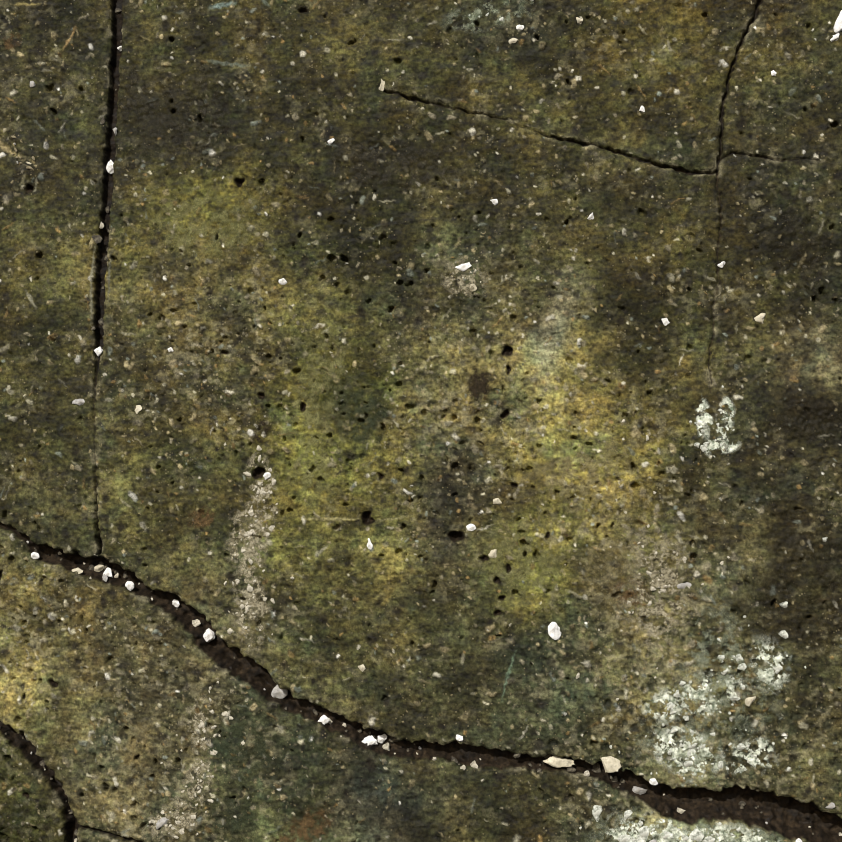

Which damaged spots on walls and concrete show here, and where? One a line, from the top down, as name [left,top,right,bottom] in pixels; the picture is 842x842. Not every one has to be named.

crack [377,0,829,395]
crack [90,0,124,556]
efflorescence [689,398,738,457]
water stain [757,564,792,614]
crack [0,520,842,842]
water stain [646,641,788,779]
water stain [592,805,602,822]
water stain [609,810,768,842]